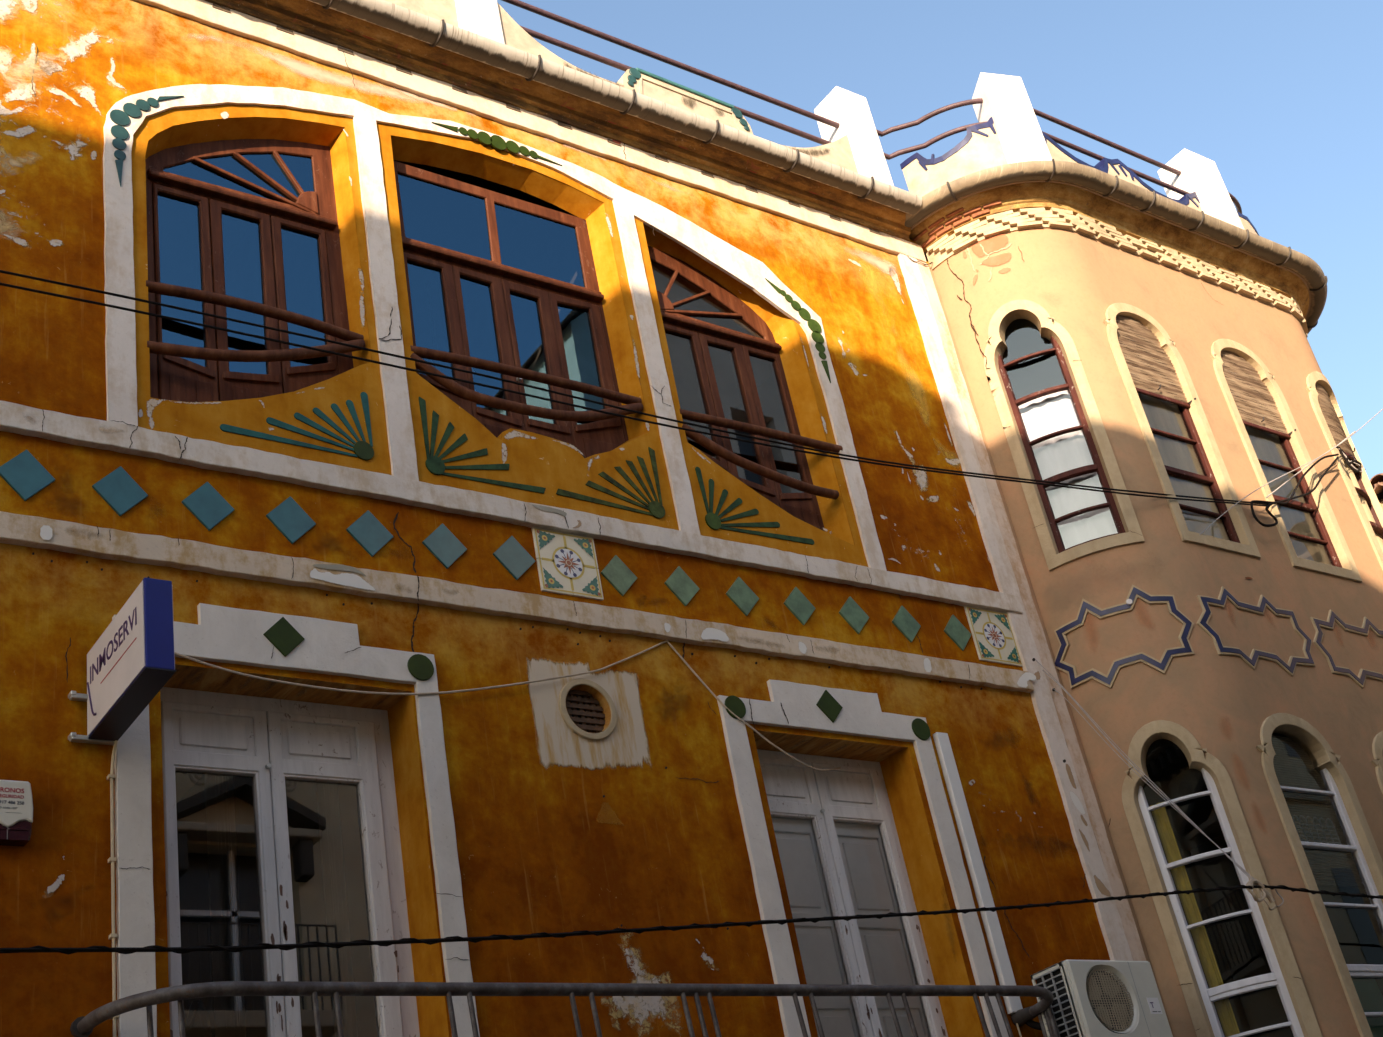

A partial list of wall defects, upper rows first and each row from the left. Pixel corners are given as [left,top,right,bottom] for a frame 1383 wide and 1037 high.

peeling [0,0,124,246]
peeling [889,263,904,303]
crack [907,243,1024,369]
peeling [894,431,938,502]
crack [393,512,419,652]
peeling [601,934,680,1036]